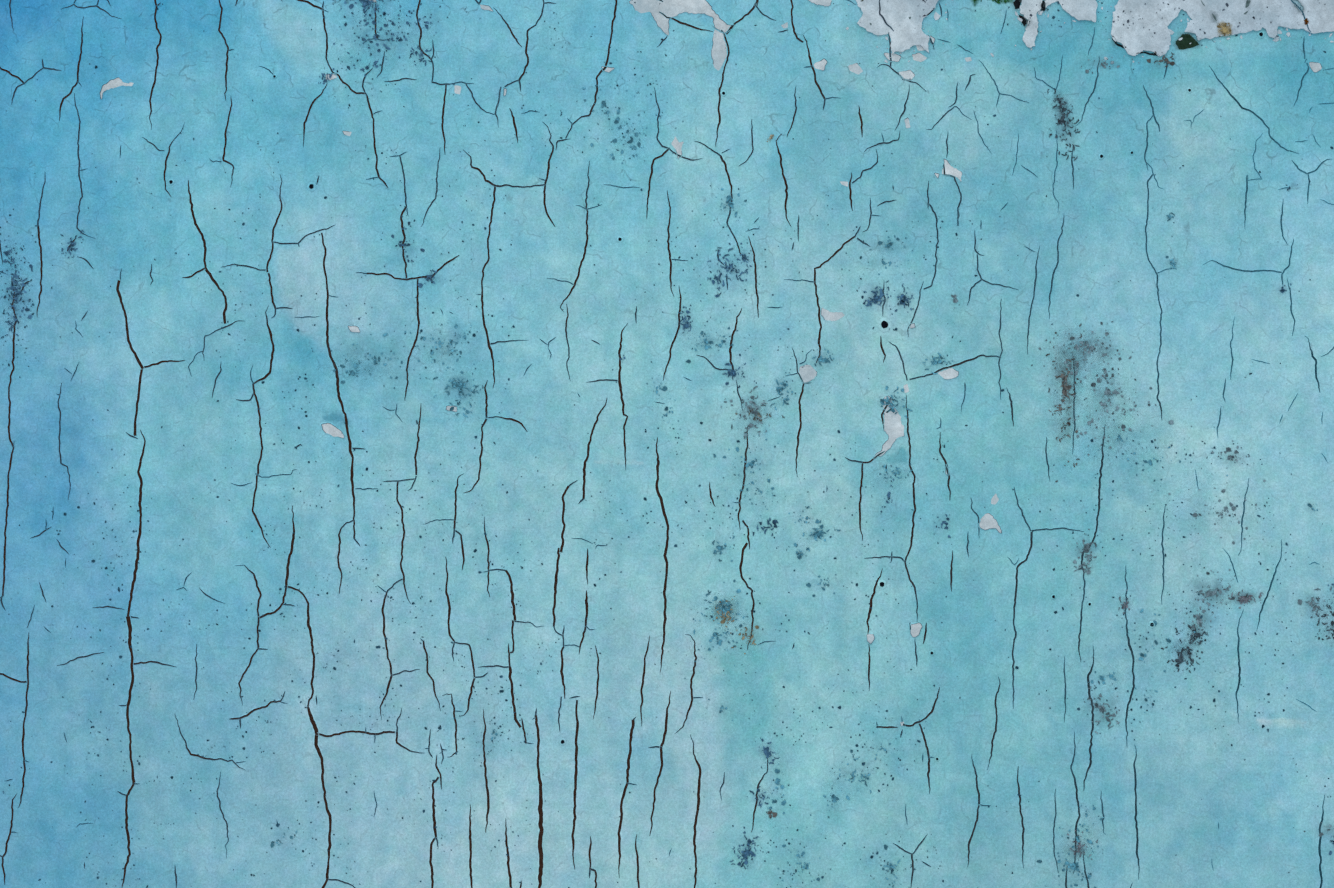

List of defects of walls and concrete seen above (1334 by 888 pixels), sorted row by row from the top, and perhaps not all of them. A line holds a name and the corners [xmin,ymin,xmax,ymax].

peeling [628,0,735,72]
peeling [813,57,829,72]
flaking render [856,0,939,81]
flaking render [1014,0,1334,56]
peeling [1308,61,1323,74]
crack [1143,0,1334,462]
crack [0,0,121,885]
peeling [872,383,910,459]
crack [967,352,1140,888]
crack [1159,504,1167,604]
crack [1223,478,1320,722]
crack [1317,795,1325,888]